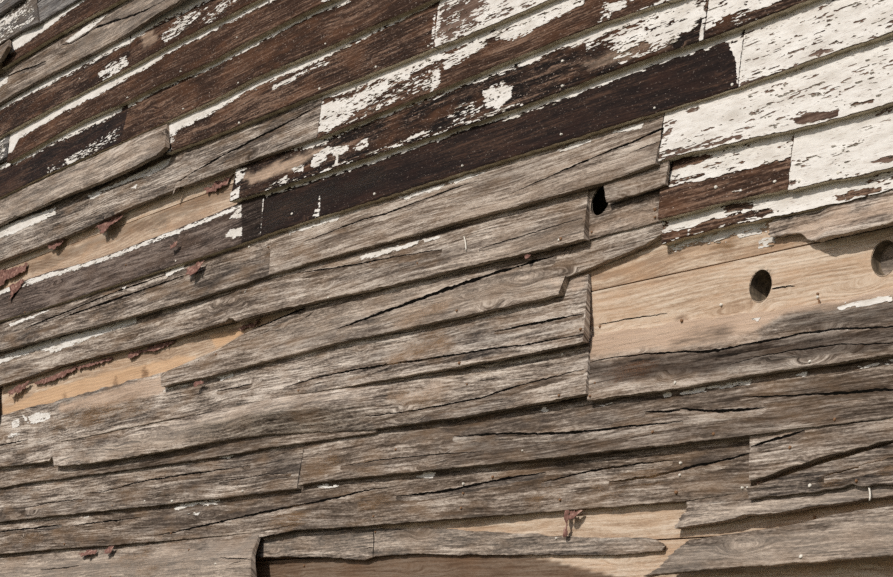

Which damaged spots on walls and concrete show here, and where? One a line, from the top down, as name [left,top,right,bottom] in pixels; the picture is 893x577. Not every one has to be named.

peeling [0,0,351,171]
peeling [88,0,893,252]
peeling [0,167,248,295]
peeling [360,235,441,260]
peeling [0,317,137,364]
crack [24,275,184,331]
crack [336,254,557,336]
crack [283,313,666,392]
crack [364,325,893,422]
crack [340,388,893,470]
crack [0,465,291,535]
crack [155,430,805,542]